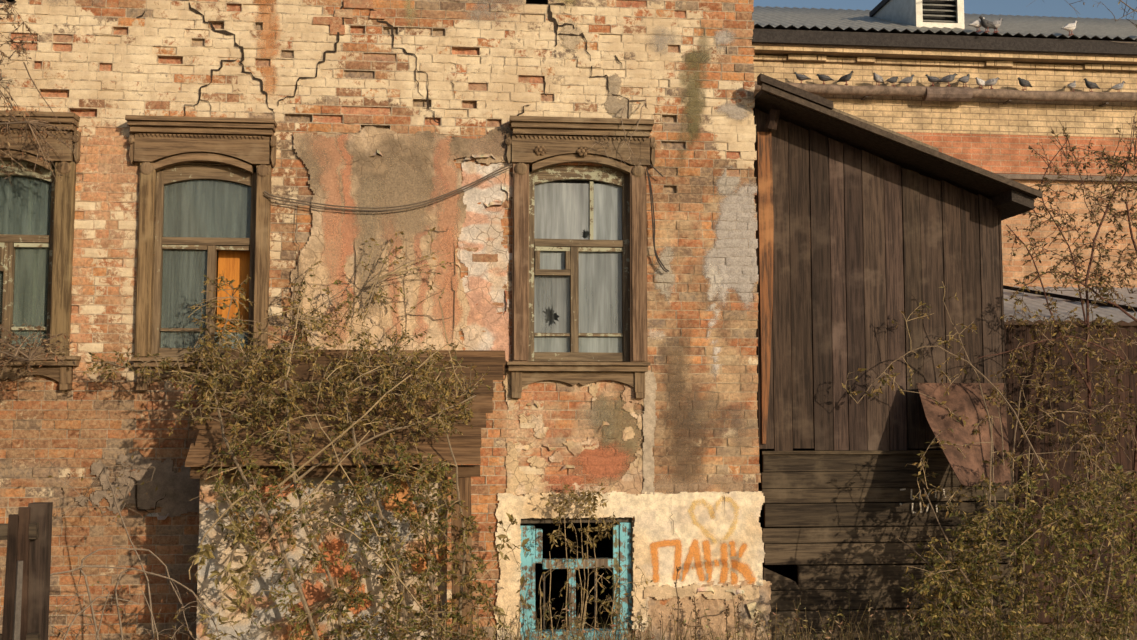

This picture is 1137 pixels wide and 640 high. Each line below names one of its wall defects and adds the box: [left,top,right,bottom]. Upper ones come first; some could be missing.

crack [184,2,455,124]
crack [548,3,647,119]
water stain [679,27,708,159]
flaking render [455,154,644,496]
water stain [706,264,728,370]
water stain [642,332,755,494]